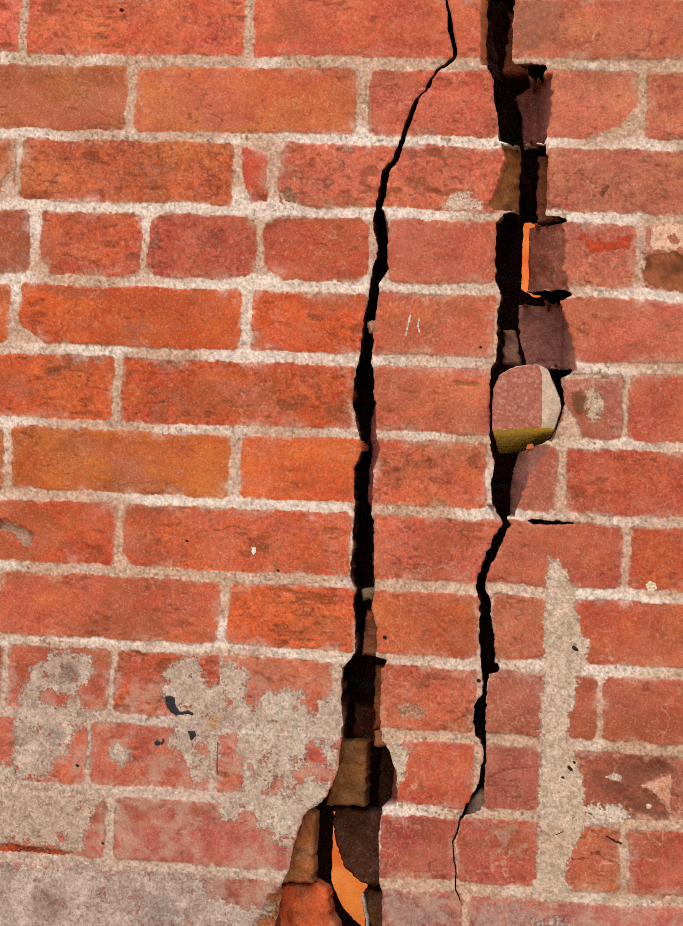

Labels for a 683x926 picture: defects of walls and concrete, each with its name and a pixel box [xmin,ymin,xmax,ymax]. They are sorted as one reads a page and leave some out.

spalling [0,842,70,855]
crack [275,0,457,926]
crack [452,0,572,901]